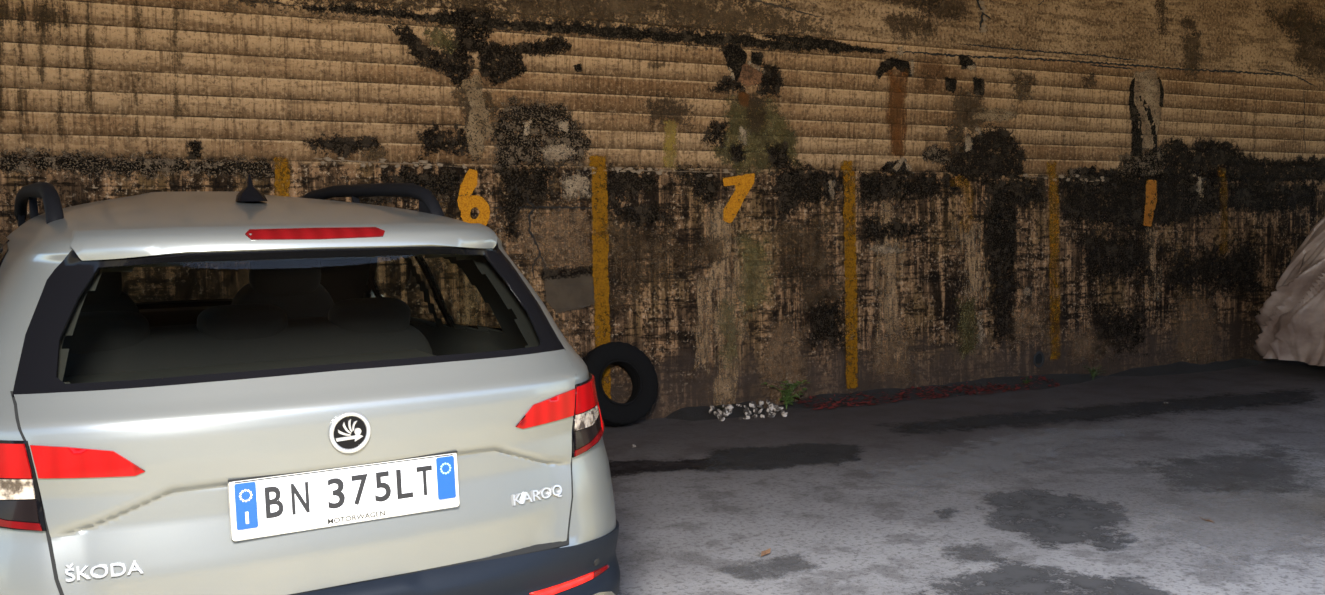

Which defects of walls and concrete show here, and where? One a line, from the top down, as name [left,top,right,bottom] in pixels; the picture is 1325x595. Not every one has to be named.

leakage [0,0,277,182]
leakage [270,0,839,242]
crack [237,0,1313,151]
leakage [882,0,972,41]
leakage [419,258,492,325]
leakage [768,120,1325,384]